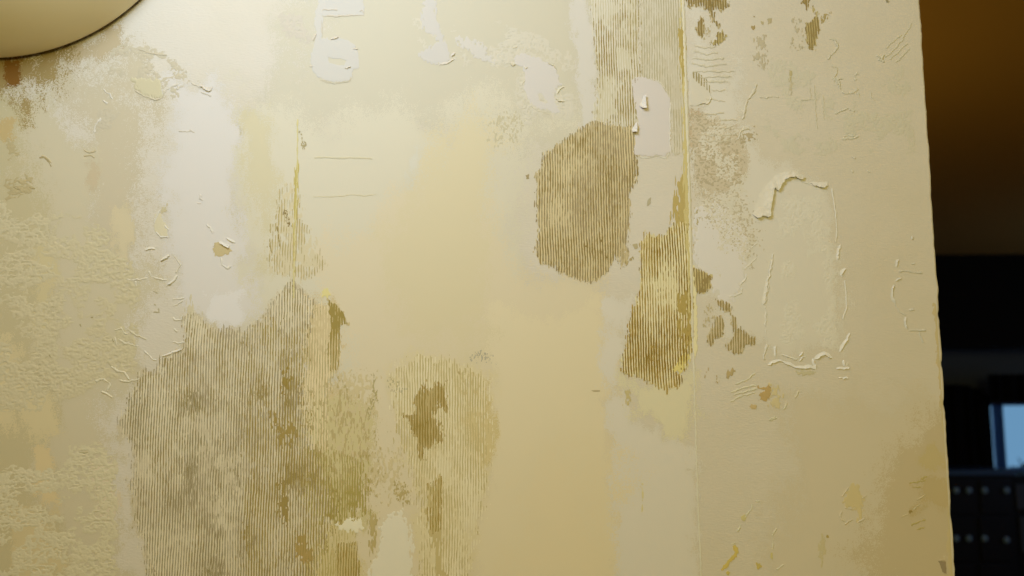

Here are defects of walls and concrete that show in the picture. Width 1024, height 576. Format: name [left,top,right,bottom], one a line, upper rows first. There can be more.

peeling [309,0,365,84]
peeling [631,77,671,159]
peeling [753,172,828,218]
peeling [206,224,235,257]
peeling [768,333,850,379]